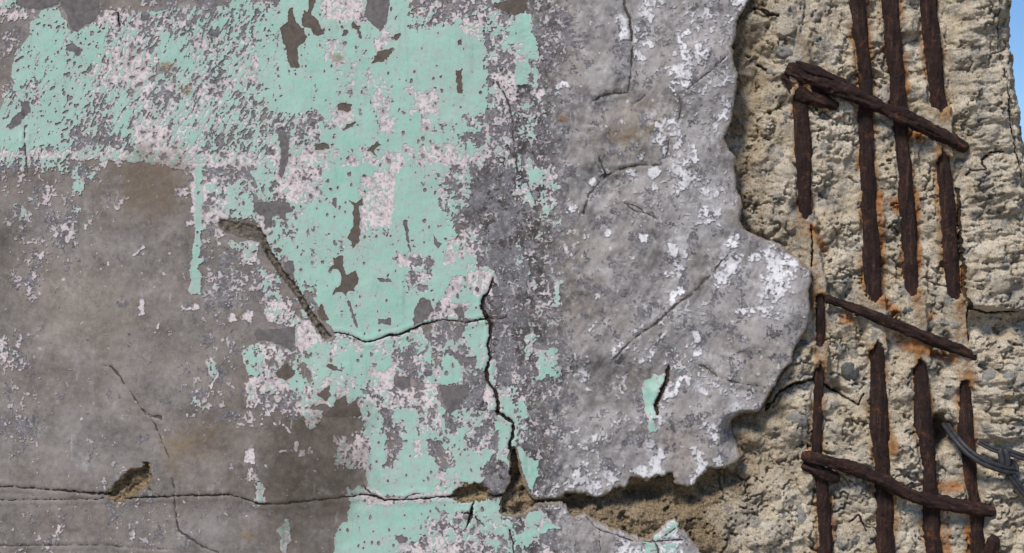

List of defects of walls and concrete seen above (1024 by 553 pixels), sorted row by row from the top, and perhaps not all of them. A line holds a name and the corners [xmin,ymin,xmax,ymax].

crack [593,0,645,104]
peeling [0,0,813,553]
crack [626,203,657,219]
crack [582,55,728,214]
crack [615,254,728,357]
spalling [781,0,977,360]
corrosion [860,157,899,317]
crack [0,278,515,553]
crack [654,365,670,415]
crack [699,364,864,411]
spalling [801,340,1000,553]